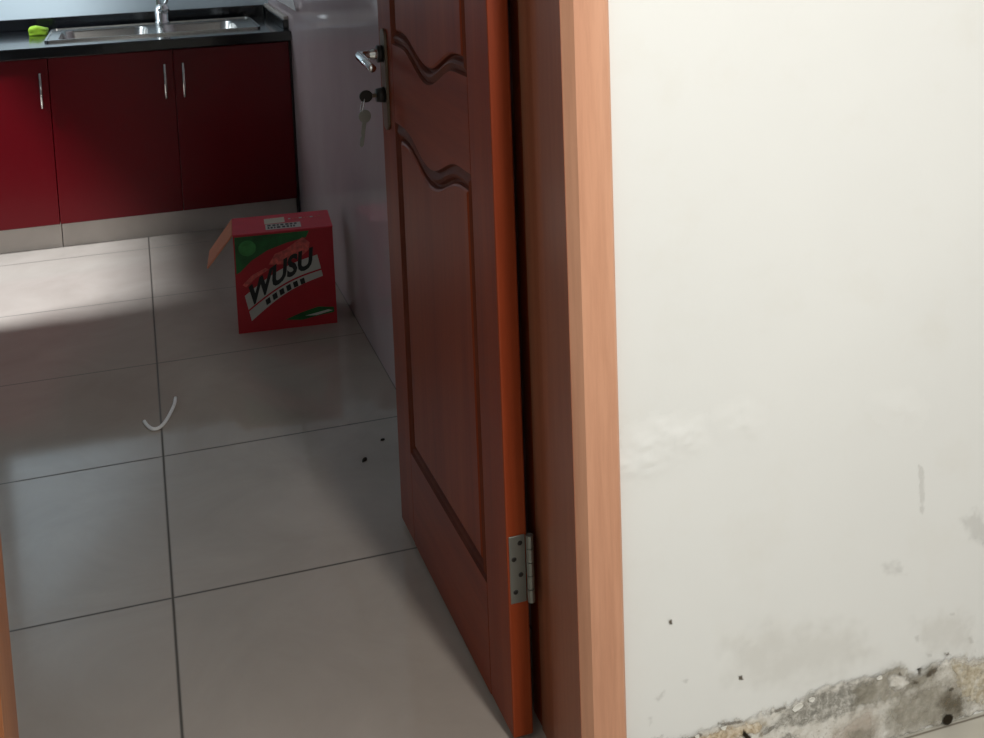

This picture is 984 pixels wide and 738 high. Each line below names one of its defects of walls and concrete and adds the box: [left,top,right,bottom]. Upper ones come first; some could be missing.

spalling [687,656,984,738]